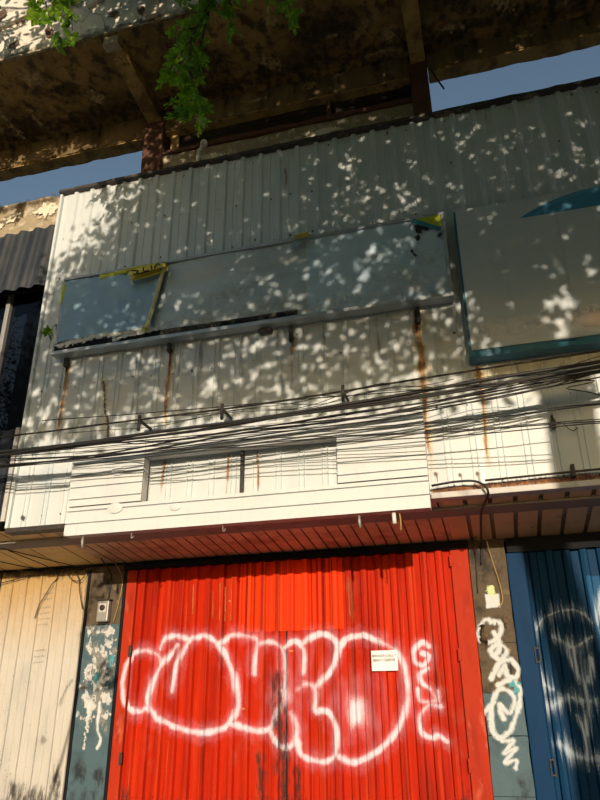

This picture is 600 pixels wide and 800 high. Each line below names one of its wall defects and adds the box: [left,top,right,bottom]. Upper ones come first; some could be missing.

damp [0,3,199,62]
damp [157,5,407,112]
damp [423,0,600,53]
damp [0,77,142,161]
peeling [0,213,21,229]
peeling [32,202,58,219]
rust [58,364,70,425]
rust [164,351,173,422]
rust [412,309,430,451]
rust [476,365,488,454]